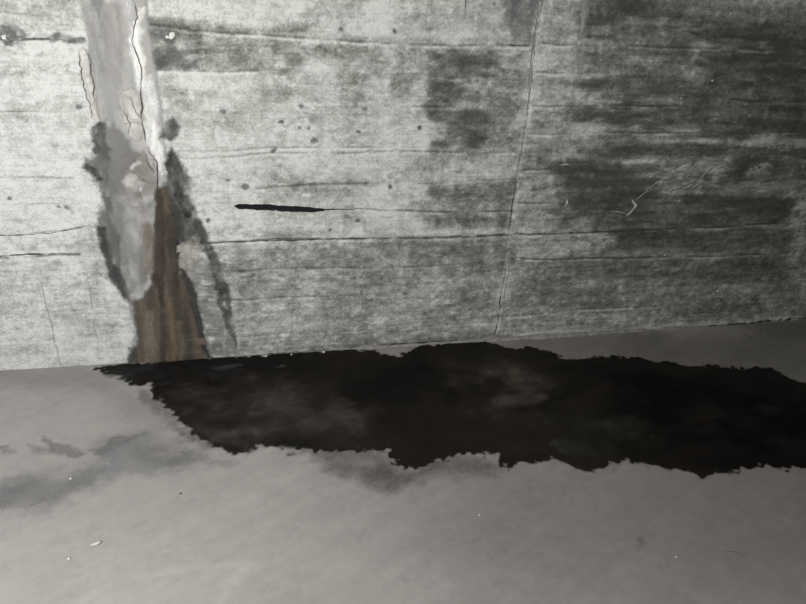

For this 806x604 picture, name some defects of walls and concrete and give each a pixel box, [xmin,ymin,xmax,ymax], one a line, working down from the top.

water stain [83,123,129,300]
peeling [122,149,155,207]
crack [125,0,158,194]
rust [133,188,211,363]
water stain [93,0,806,488]
crack [454,0,543,238]